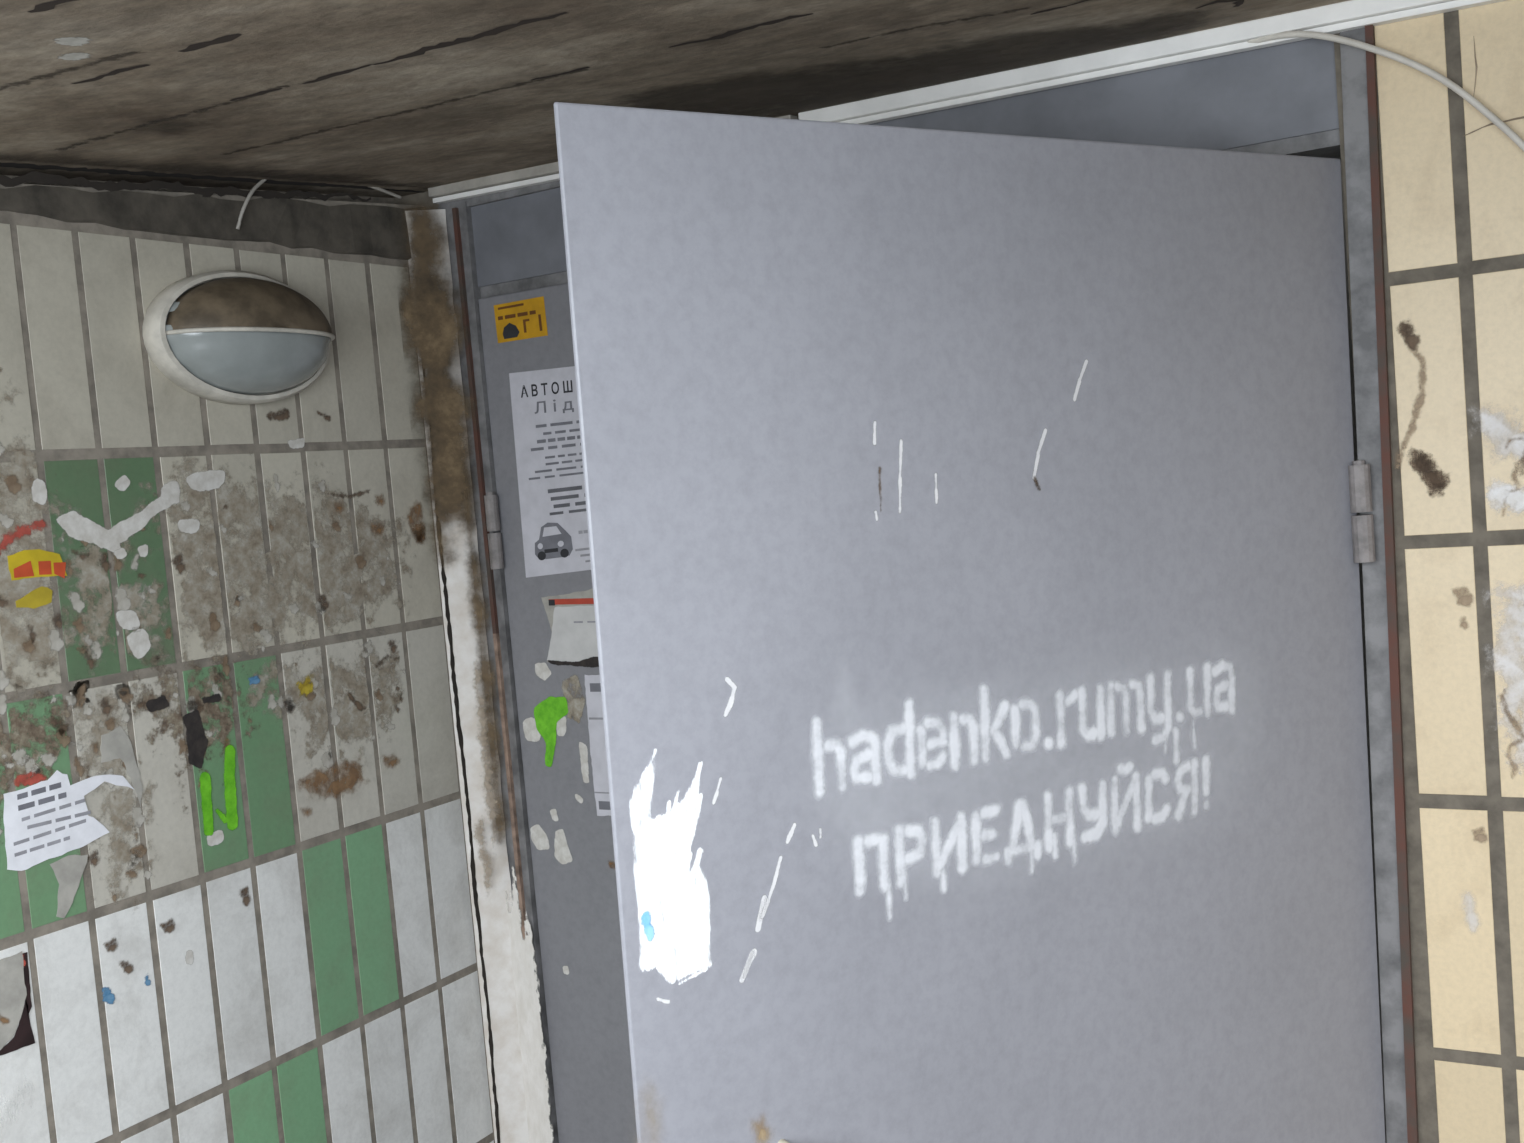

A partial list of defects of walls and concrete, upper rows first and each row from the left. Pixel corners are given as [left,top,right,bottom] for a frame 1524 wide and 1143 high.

crack [28,0,77,13]
crack [669,0,1089,48]
crack [0,12,590,201]
water stain [631,12,1203,118]
crack [1463,41,1524,137]
water stain [0,157,417,187]
peeling [4,475,47,505]
peeling [115,475,130,491]
peeling [178,470,225,534]
peeling [0,527,172,878]
water stain [1501,695,1523,773]
peeling [207,830,224,846]